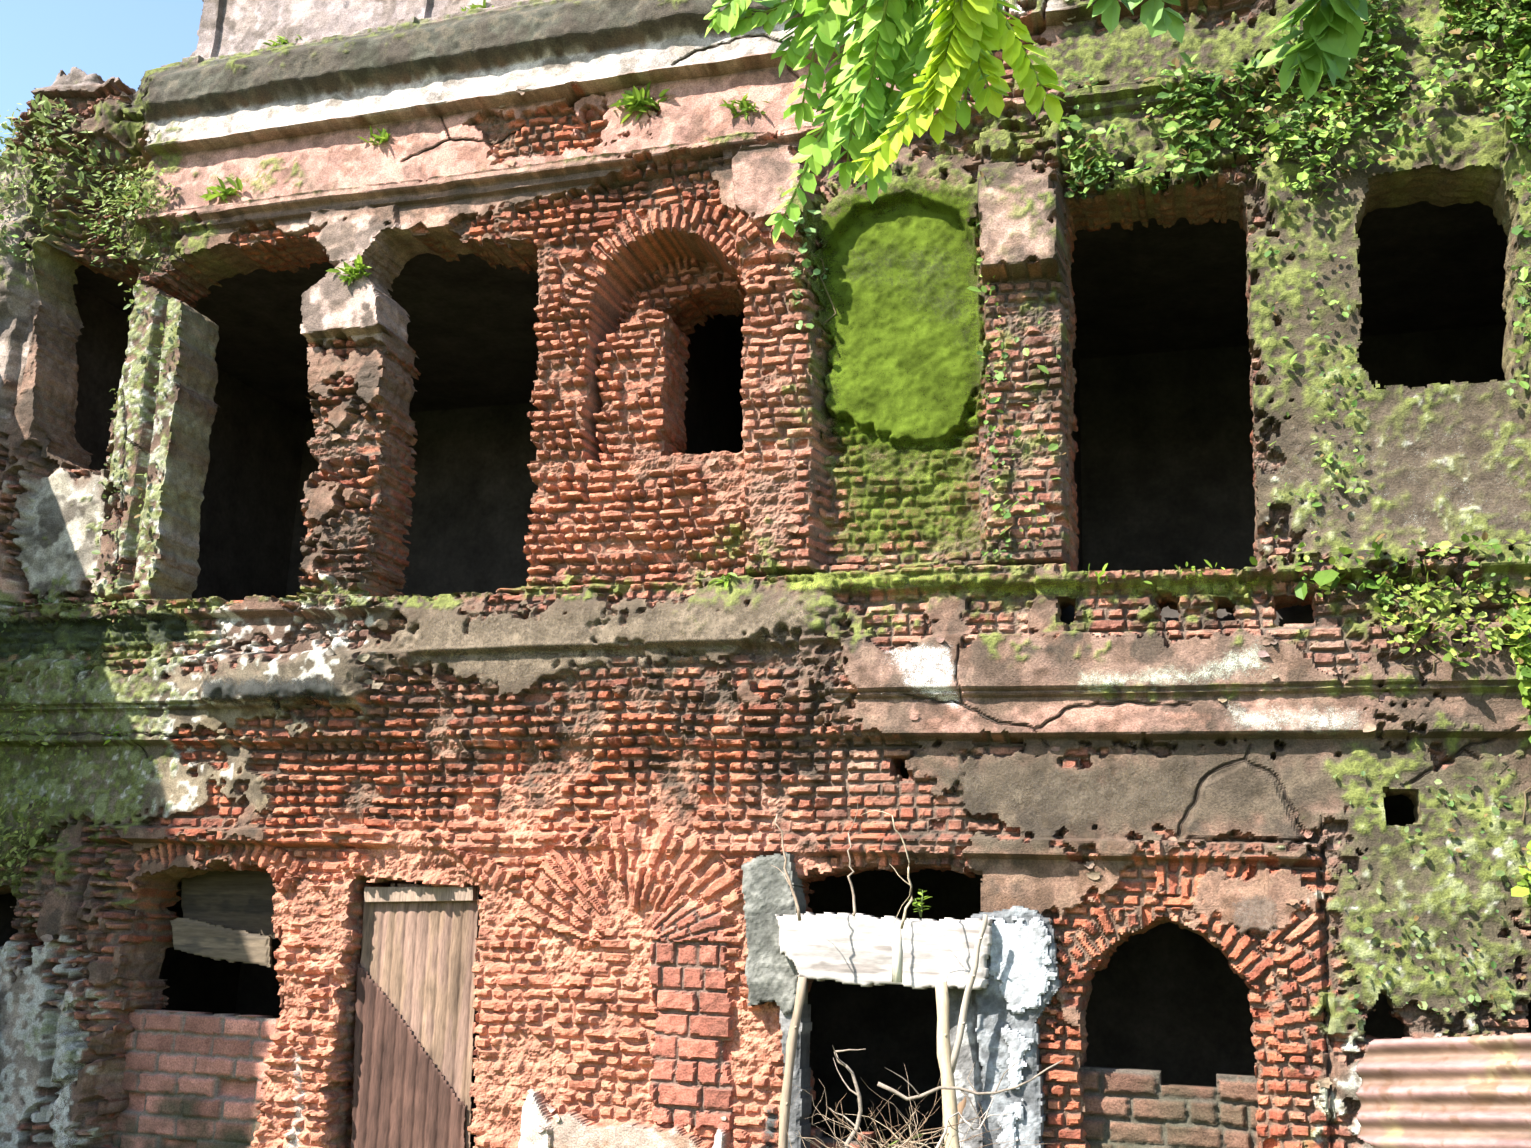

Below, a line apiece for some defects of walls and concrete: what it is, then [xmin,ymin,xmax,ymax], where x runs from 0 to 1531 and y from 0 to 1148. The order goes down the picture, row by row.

crack [403,117,524,161]
peeling [144,30,816,166]
crack [673,35,839,113]
peeling [1002,0,1076,27]
spalling [298,424,385,597]
water stain [0,612,189,693]
crack [902,652,1189,743]
spalling [253,628,1389,1148]
crack [1176,747,1333,1143]
water stain [52,1016,83,1148]